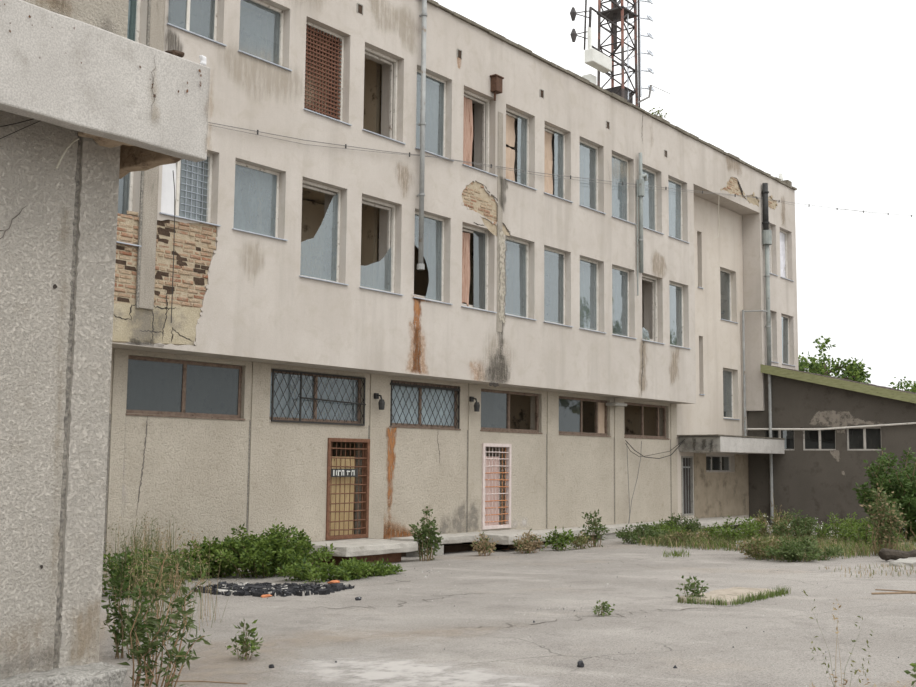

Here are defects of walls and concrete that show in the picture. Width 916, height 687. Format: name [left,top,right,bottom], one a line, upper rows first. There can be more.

spalling [721,177,778,210]
flaking render [114,211,139,304]
flaking render [154,220,219,324]
flaking render [462,180,510,323]
corrosion [412,297,425,373]
leakage [487,324,507,387]
corrosion [387,427,397,507]
corrosion [383,525,413,539]